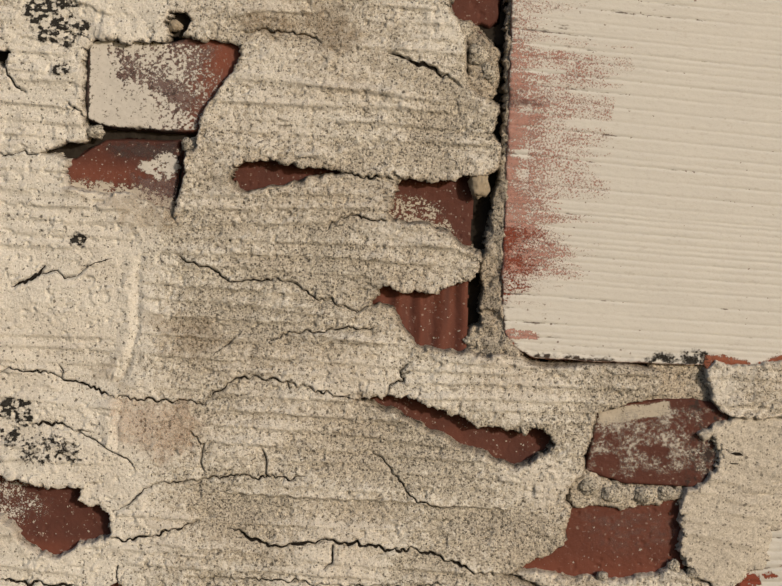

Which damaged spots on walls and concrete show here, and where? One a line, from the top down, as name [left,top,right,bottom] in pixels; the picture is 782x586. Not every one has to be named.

spalling [66,37,241,215]
crack [12,258,112,287]
crack [177,255,375,341]
spalling [372,281,469,351]
crack [2,365,351,405]
crack [26,421,136,470]
spalling [361,395,553,464]
spalling [583,398,729,487]
crack [1,578,76,586]
spalling [0,475,111,554]
crack [230,528,494,586]
spalling [523,499,684,578]